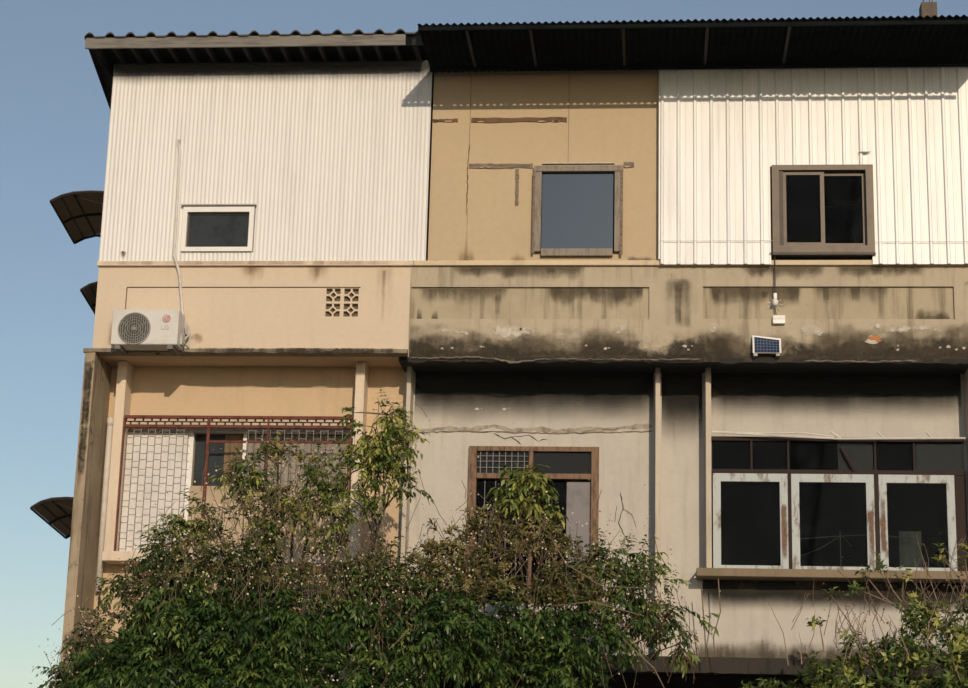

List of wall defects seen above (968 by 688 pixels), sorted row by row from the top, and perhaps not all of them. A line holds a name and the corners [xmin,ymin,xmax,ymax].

water stain [459,267,580,275]
water stain [748,267,820,275]
water stain [427,289,502,298]
water stain [551,288,642,300]
water stain [712,288,799,302]
water stain [819,288,884,297]
water stain [409,314,968,421]
water stain [78,367,92,472]